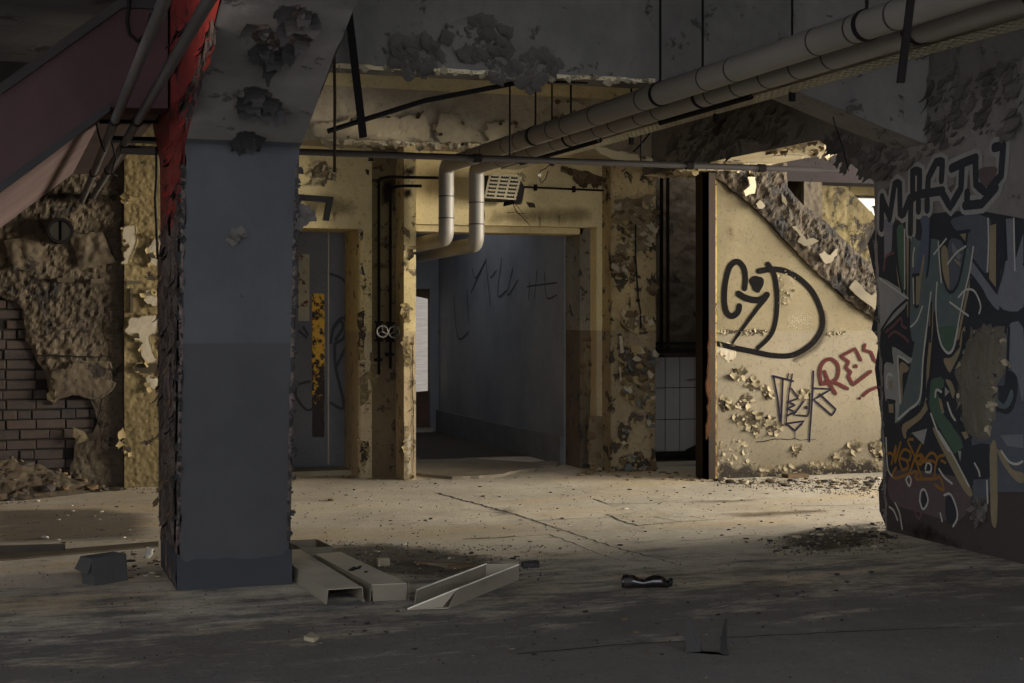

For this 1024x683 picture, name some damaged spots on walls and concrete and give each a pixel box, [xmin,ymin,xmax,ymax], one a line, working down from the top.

peeling [231,4,322,156]
peeling [336,12,658,95]
peeling [651,55,1024,183]
flaking render [0,300,96,475]
flaking render [116,428,132,457]
peeling [120,18,216,546]
corrosion [312,293,325,437]
flaking render [286,111,524,541]
peeling [587,415,657,472]
peeling [611,194,661,277]
peeling [618,347,660,428]
peeling [716,206,887,531]